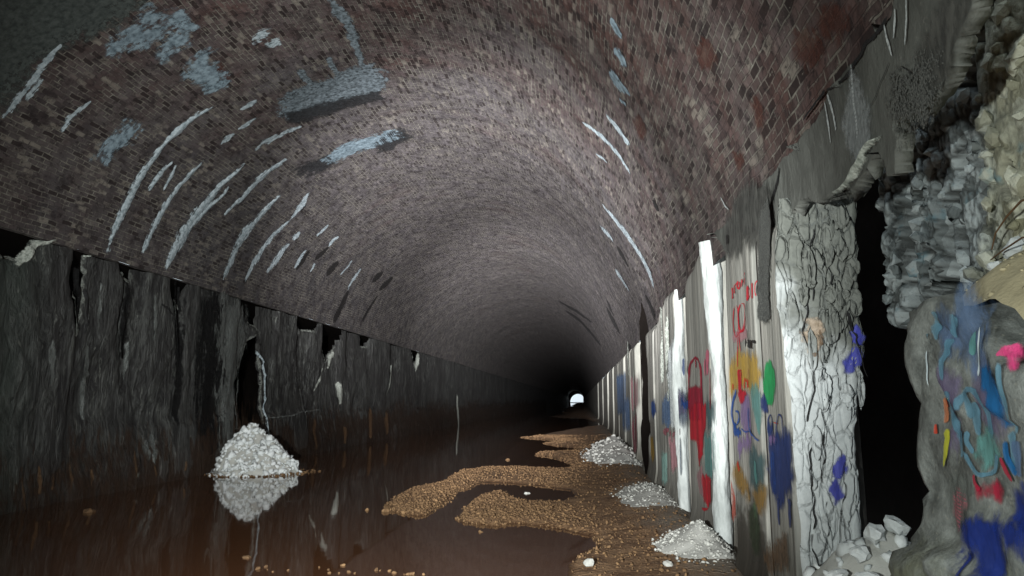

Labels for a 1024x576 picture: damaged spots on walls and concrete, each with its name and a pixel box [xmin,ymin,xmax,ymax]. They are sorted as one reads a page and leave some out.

damp [0,0,230,118]
damp [255,0,389,151]
damp [609,18,630,106]
damp [83,107,212,257]
damp [165,158,287,269]
damp [245,193,309,282]
damp [320,130,404,164]
damp [583,114,630,173]
damp [600,204,654,288]
spalling [875,0,1024,329]
damp [214,196,280,451]
crack [802,229,868,566]